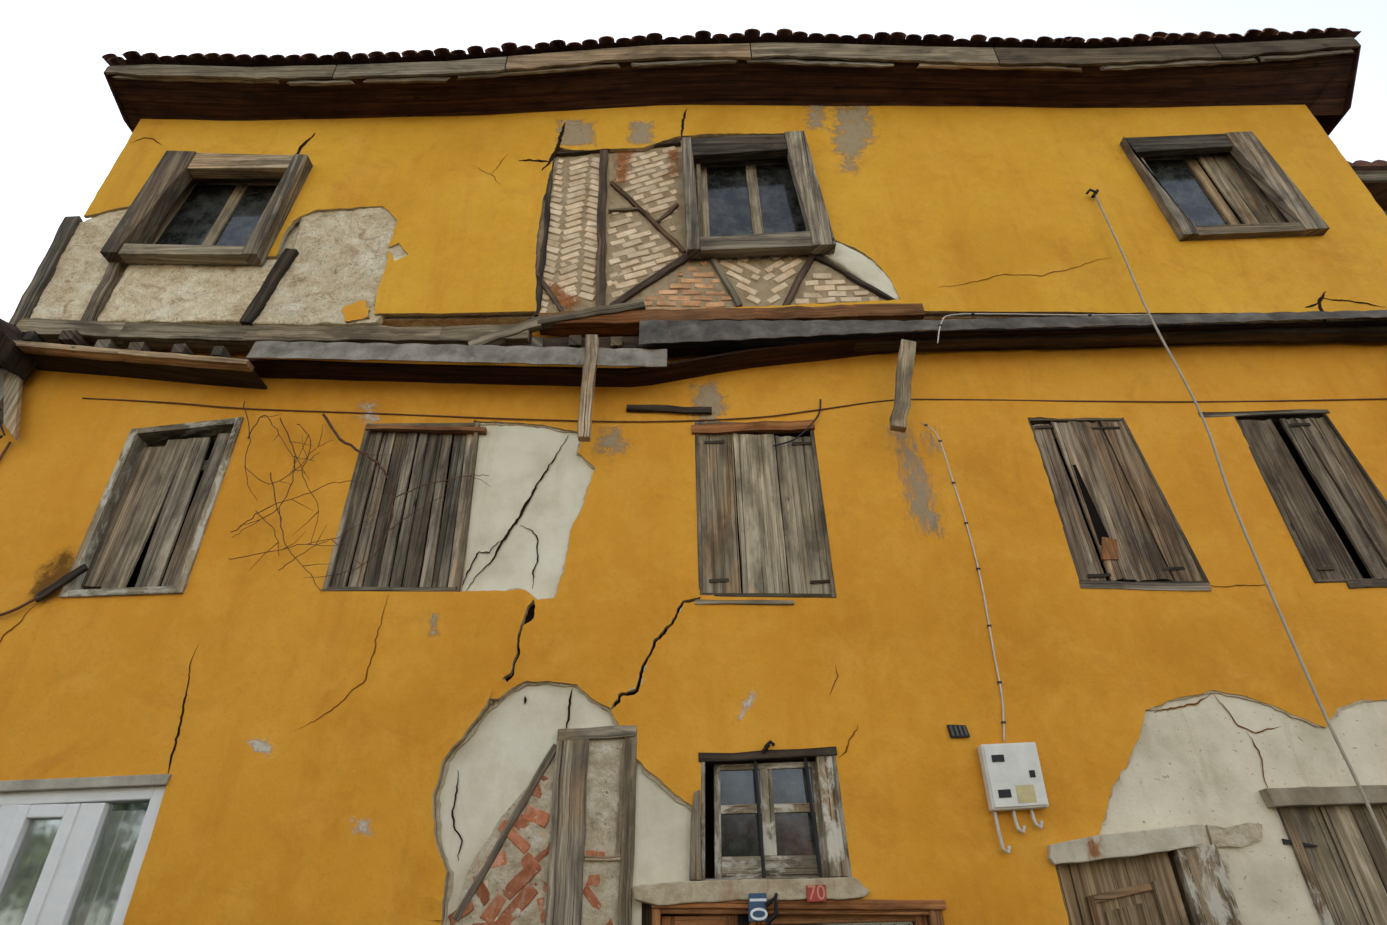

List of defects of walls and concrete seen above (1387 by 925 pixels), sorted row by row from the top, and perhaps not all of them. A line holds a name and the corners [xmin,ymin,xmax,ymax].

peeling [808,106,875,170]
flaking render [30,207,407,327]
flaking render [533,120,900,318]
crack [0,602,38,642]
crack [168,644,199,773]
crack [295,597,388,731]
crack [462,436,568,704]
flaking render [462,422,627,605]
crack [613,601,693,707]
flaking render [435,682,701,925]
flaking render [1099,690,1387,925]